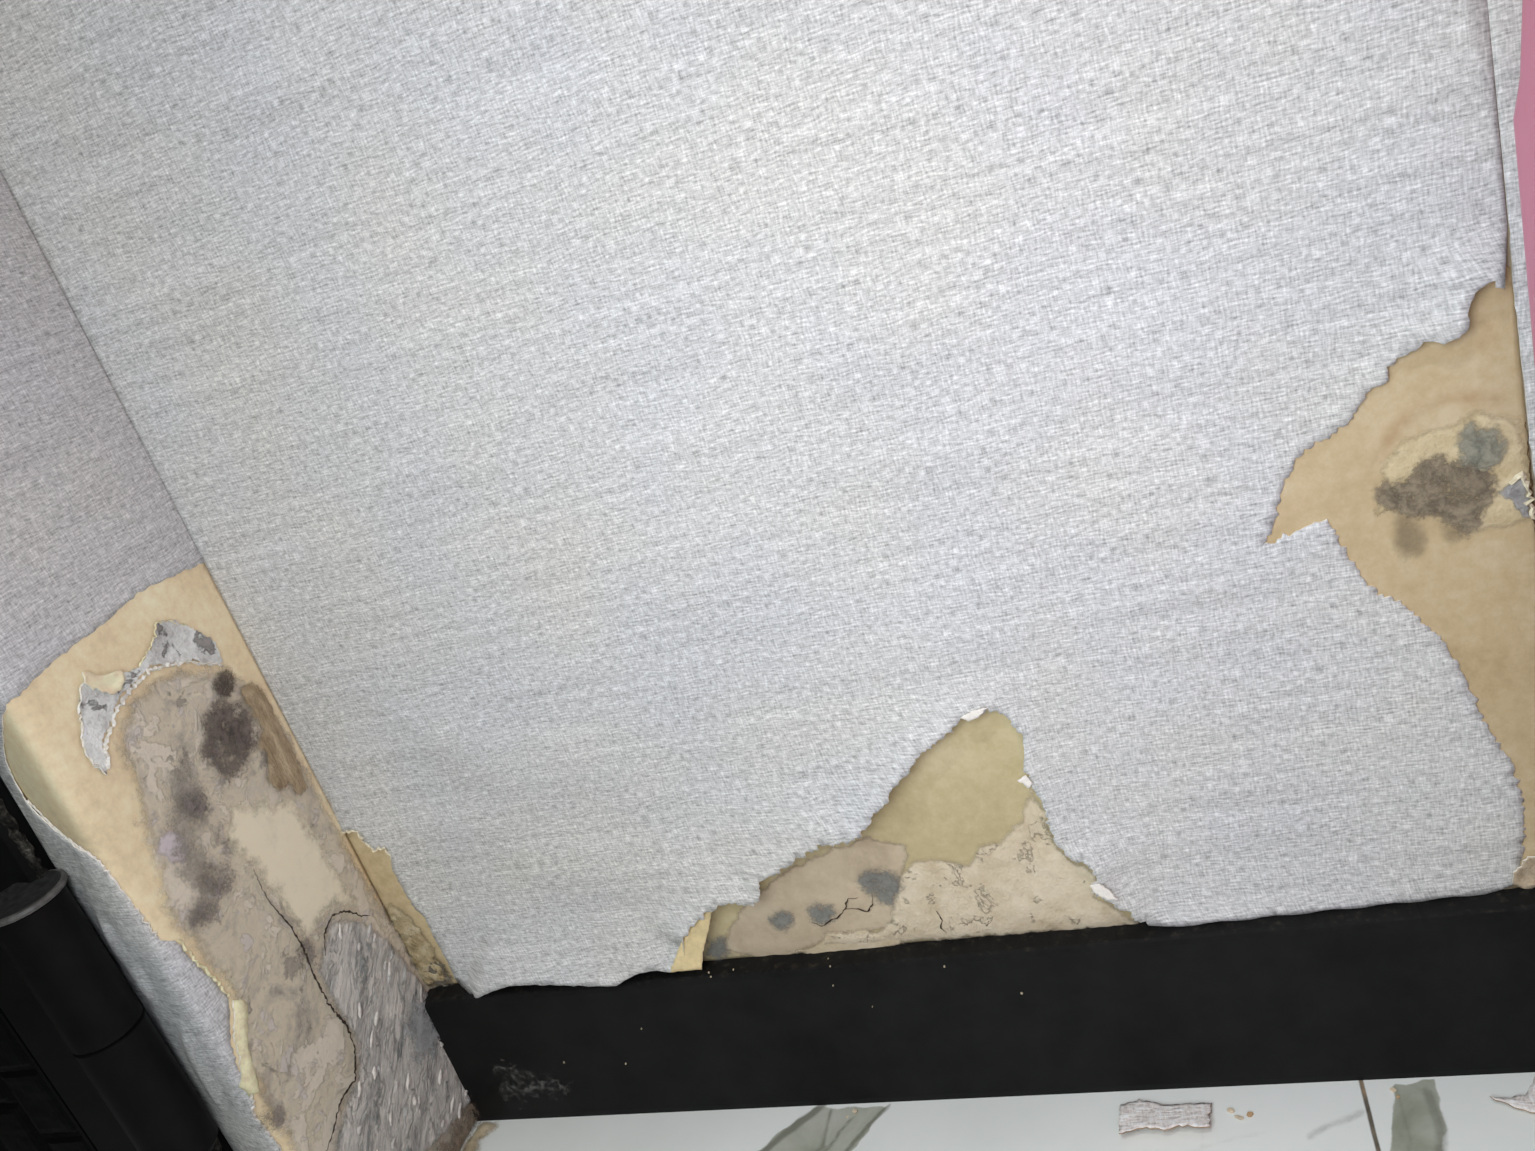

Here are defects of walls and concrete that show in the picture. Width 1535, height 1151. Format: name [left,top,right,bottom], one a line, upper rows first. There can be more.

damp [1374,422,1508,552]
flaking render [1376,412,1535,532]
damp [166,669,257,929]
flaking render [77,620,473,1151]
damp [768,904,836,930]
damp [857,871,900,905]
flaking render [725,790,1136,957]